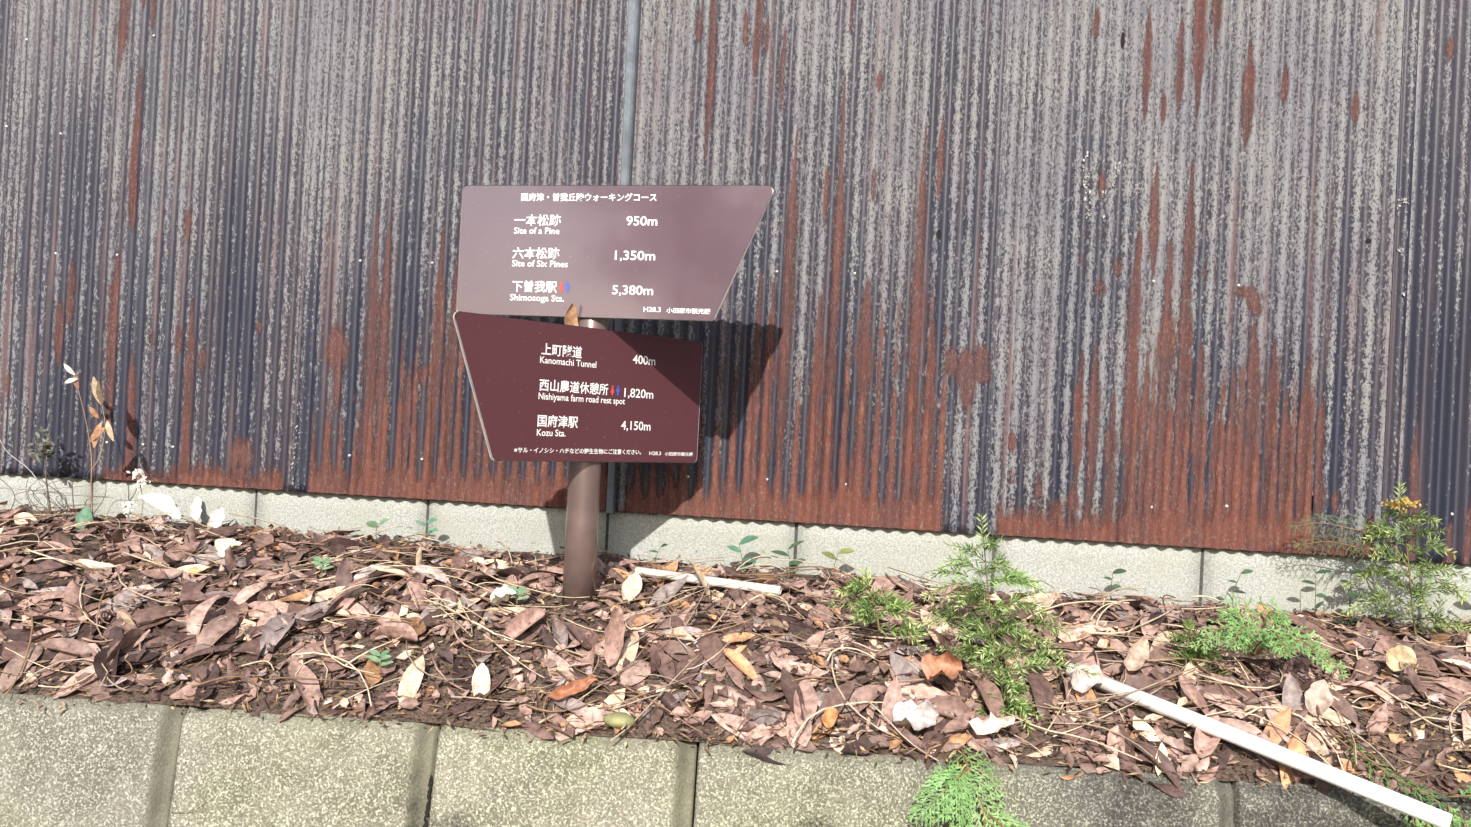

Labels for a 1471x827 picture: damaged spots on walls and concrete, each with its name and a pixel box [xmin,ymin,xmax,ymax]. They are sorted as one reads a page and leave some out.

rust [1142,0,1222,121]
rust [1242,42,1256,147]
rust [1281,66,1289,101]
rust [1351,93,1360,123]
rust [53,259,76,364]
rust [104,251,283,490]
rust [308,212,568,508]
rust [625,74,991,531]
rust [996,164,1376,558]
rust [600,462,608,510]
leakage [1245,785,1383,827]
leakage [1403,794,1471,827]